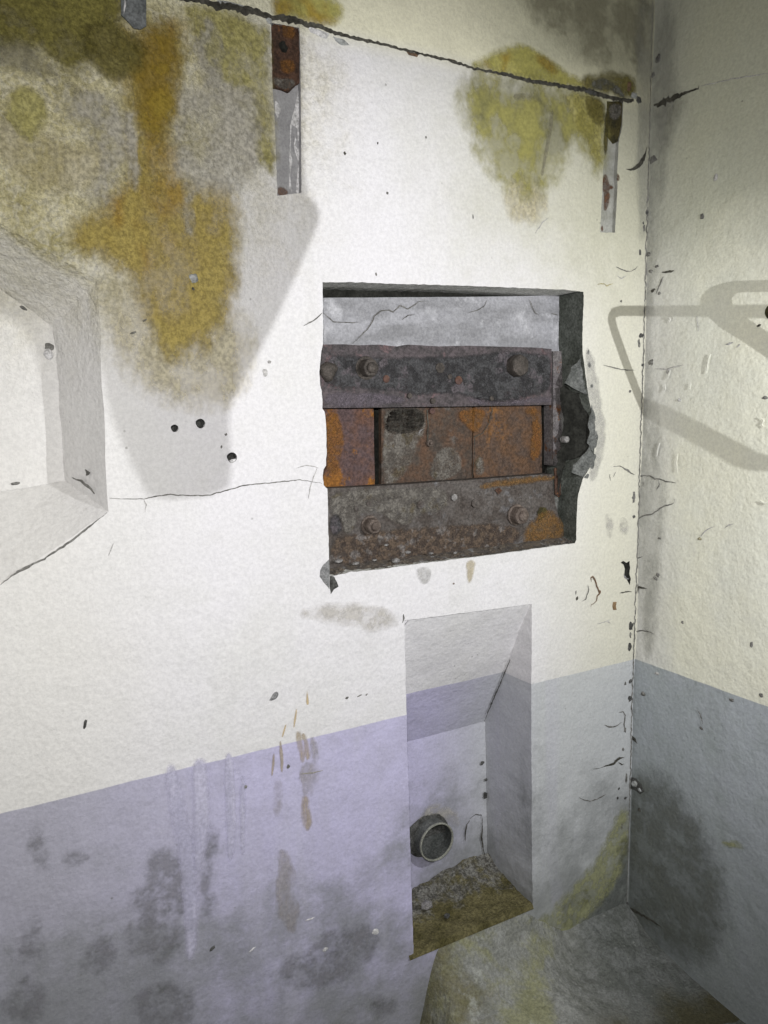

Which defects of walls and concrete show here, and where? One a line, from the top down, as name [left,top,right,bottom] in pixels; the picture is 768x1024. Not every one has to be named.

water stain [467,46,636,218]
water stain [0,0,275,393]
corrosion [603,174,619,210]
corrosion [326,414,344,475]
crack [181,0,767,927]
corrosion [526,409,541,460]
spalling [556,350,598,494]
crack [3,465,320,583]
corrosion [331,511,563,564]
corrosion [272,695,309,775]
water stain [167,761,209,957]
water stain [585,842,629,920]